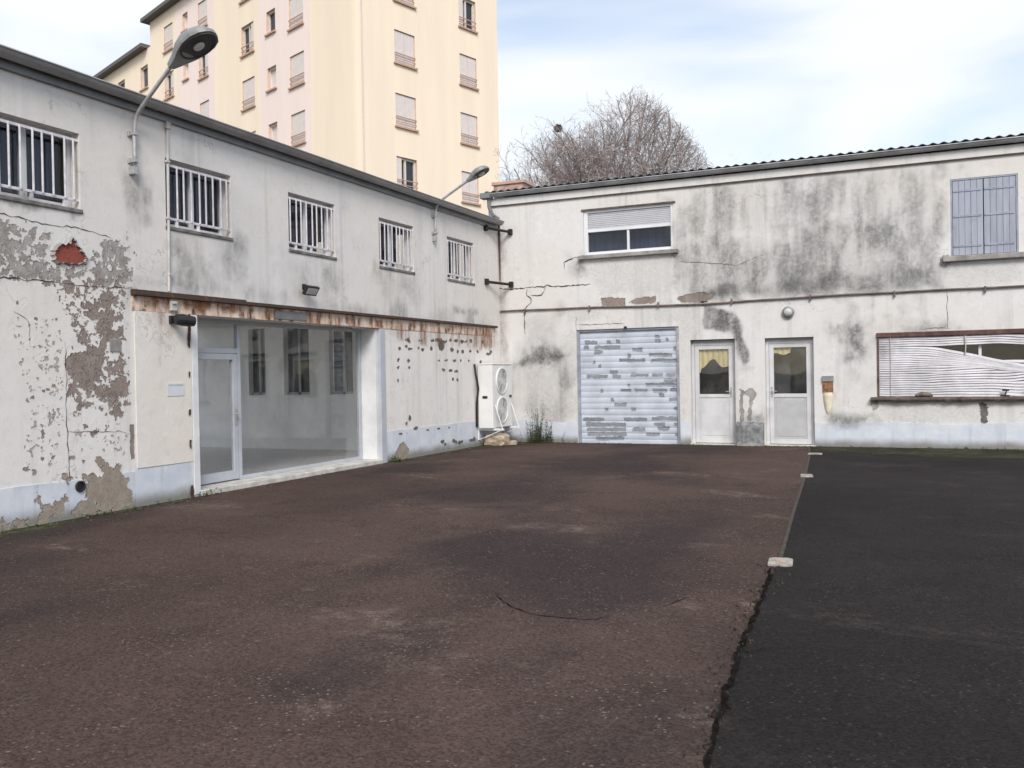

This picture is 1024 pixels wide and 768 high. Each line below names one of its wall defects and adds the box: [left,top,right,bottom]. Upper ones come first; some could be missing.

damp [779,232,851,293]
crack [499,257,588,331]
spalling [601,295,656,306]
spalling [677,291,714,303]
peeling [0,219,137,531]
corrosion [185,301,237,348]
peeling [397,338,492,382]
damp [522,349,563,364]
damp [707,309,748,363]
crack [65,346,128,476]
peeling [739,388,757,422]
peeling [395,415,476,460]